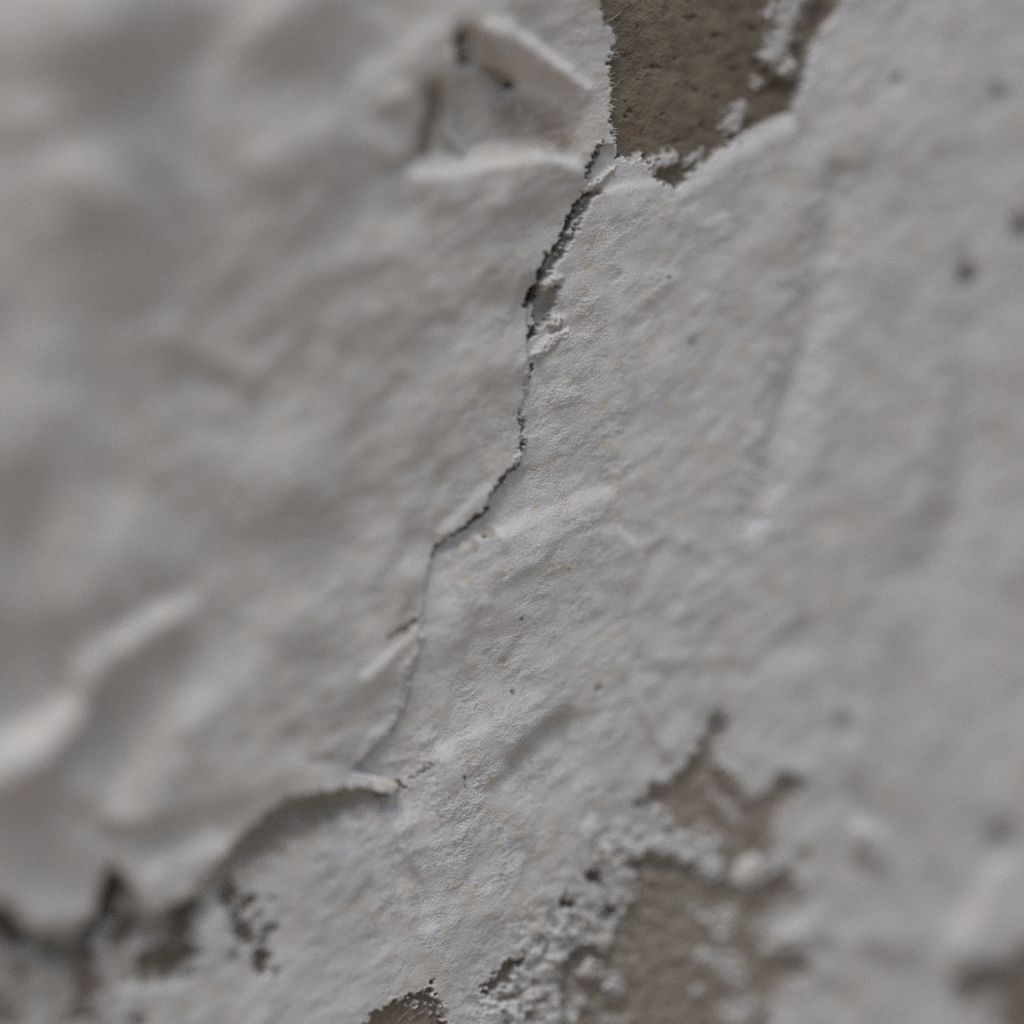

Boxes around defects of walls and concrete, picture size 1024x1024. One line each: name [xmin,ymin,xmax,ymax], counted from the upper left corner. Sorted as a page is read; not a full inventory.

spalling [599,0,844,190]
flaking render [0,0,616,1024]
crack [425,142,616,585]
crack [340,617,433,796]
spalling [539,705,811,1024]